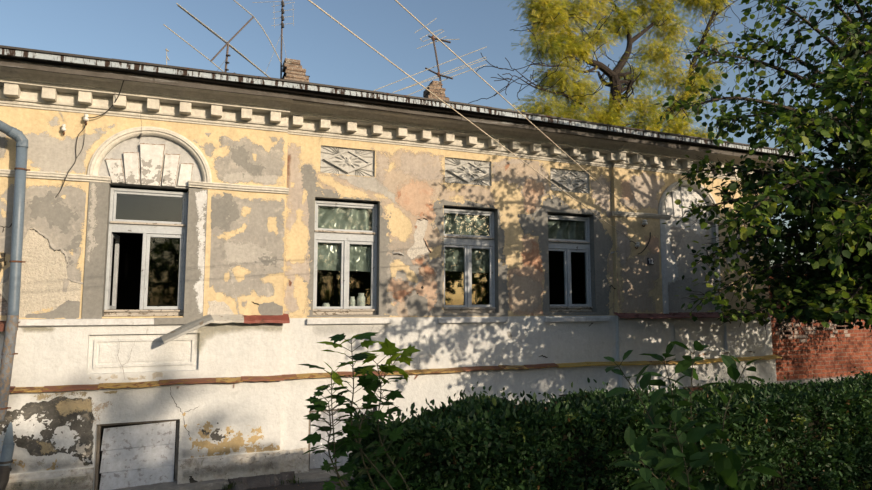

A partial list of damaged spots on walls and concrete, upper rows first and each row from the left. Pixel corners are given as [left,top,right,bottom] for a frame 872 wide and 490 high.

peeling [0,184,14,316]
peeling [19,112,115,318]
peeling [193,133,550,317]
peeling [566,172,759,313]
peeling [182,412,280,458]